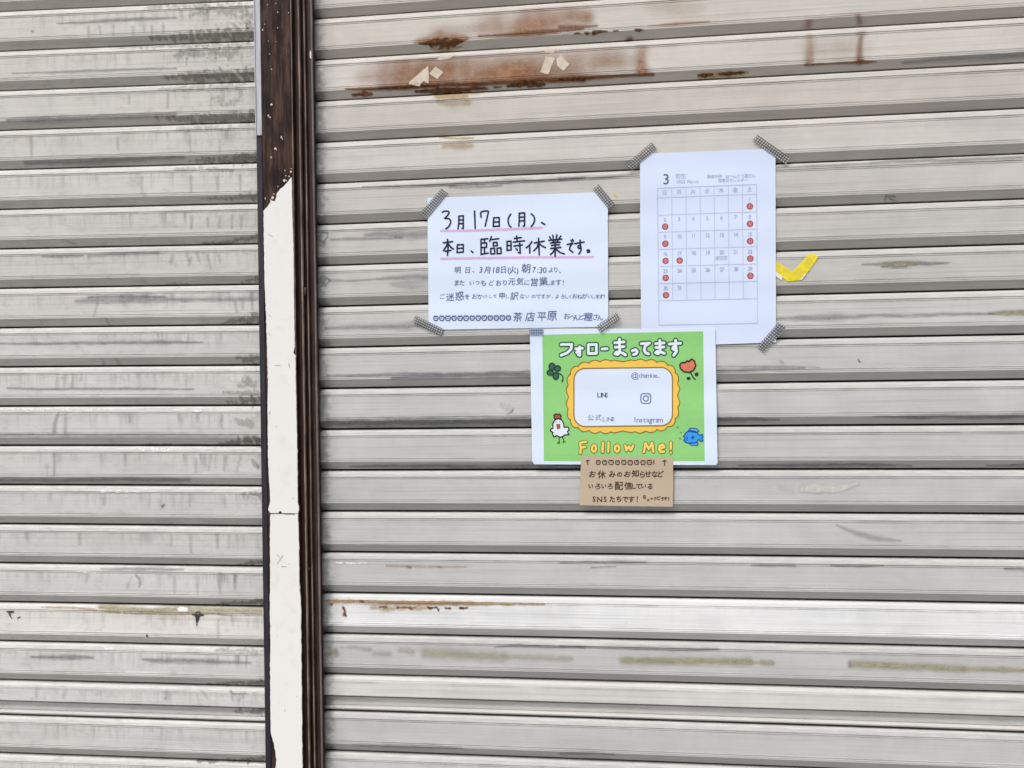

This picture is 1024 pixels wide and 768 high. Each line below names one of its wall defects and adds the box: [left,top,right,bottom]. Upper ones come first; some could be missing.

rust [345,13,654,98]
rust [805,51,875,66]
rust [328,600,544,617]